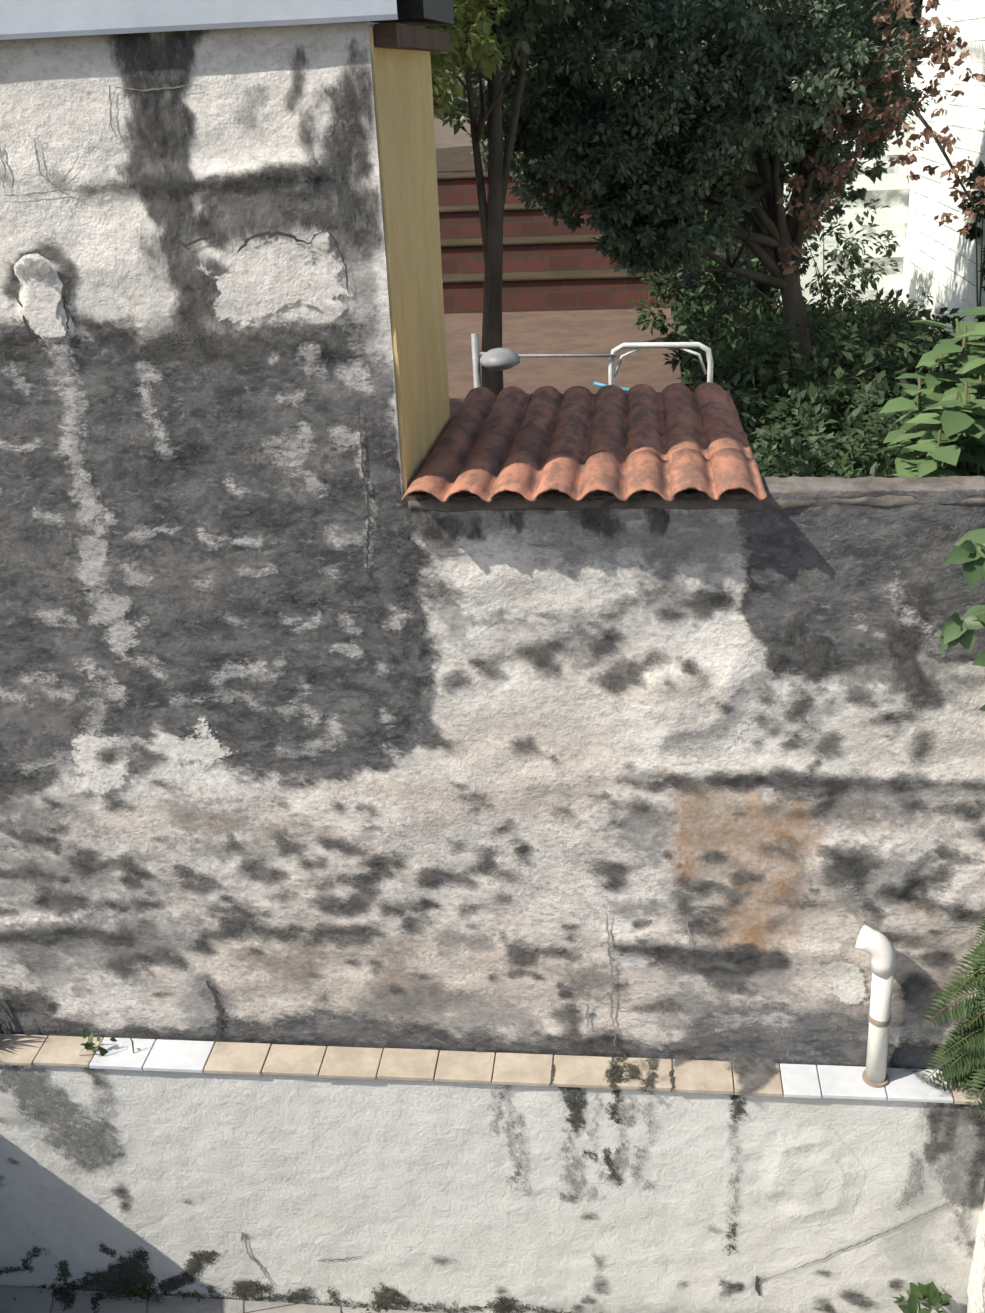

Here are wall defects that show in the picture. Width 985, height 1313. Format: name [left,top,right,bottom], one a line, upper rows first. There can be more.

crack [109,84,198,138]
crack [0,137,79,196]
peeling [198,229,371,327]
peeling [136,361,170,455]
peeling [301,342,390,392]
leakage [0,30,985,937]
peeling [197,529,261,548]
leakage [172,802,534,1007]
rust [671,851,764,937]
leakage [813,844,979,1025]
leakage [557,1051,658,1199]
crack [760,1195,966,1281]